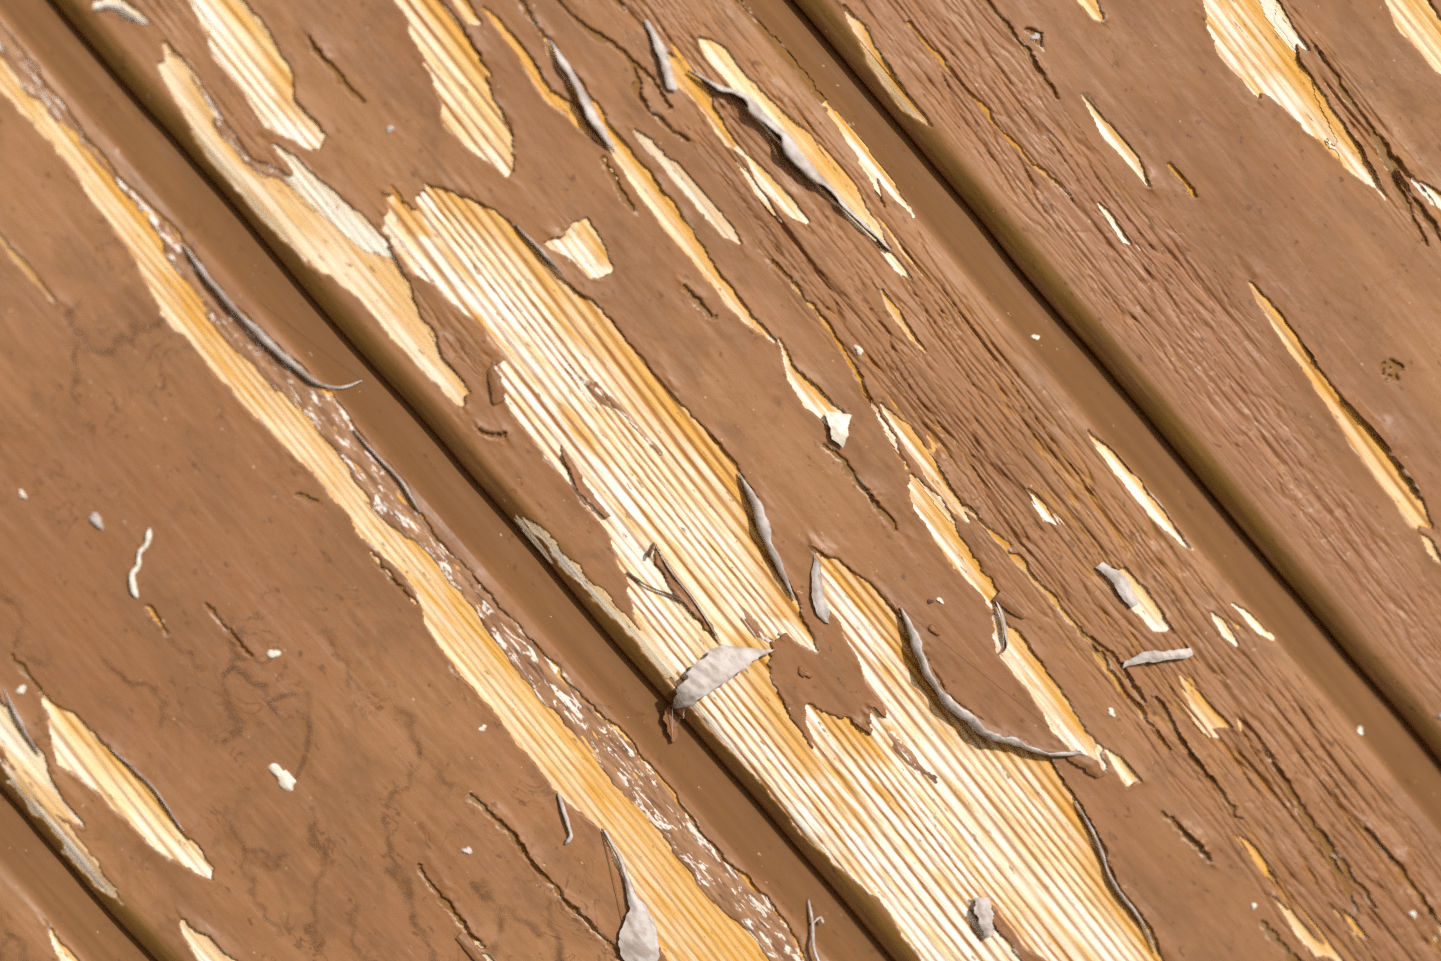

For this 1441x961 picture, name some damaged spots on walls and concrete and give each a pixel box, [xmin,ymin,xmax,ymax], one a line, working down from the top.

peeling [93,0,153,25]
peeling [1203,0,1385,197]
peeling [1385,0,1441,74]
crack [478,428,506,439]
peeling [158,0,1171,961]
crack [518,0,1441,961]
peeling [1087,431,1189,548]
peeling [1248,281,1441,564]
peeling [1122,647,1242,738]
peeling [49,927,79,961]
peeling [0,685,213,904]
crack [467,793,624,961]